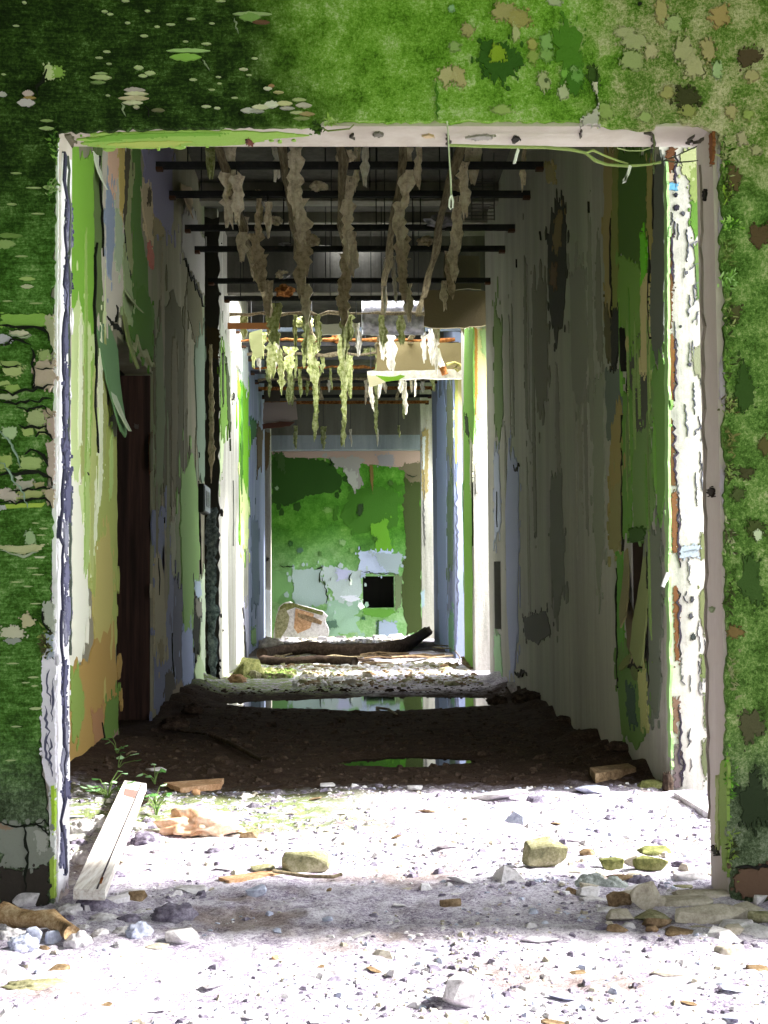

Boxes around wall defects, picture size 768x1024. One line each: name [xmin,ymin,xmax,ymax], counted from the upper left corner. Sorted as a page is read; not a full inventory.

peeling [92,147,207,437]
peeling [149,485,206,721]
flaking render [225,348,249,451]
peeling [256,421,426,637]
peeling [446,379,454,474]
leakage [436,147,674,770]
rust [669,229,681,560]
rust [672,585,682,668]